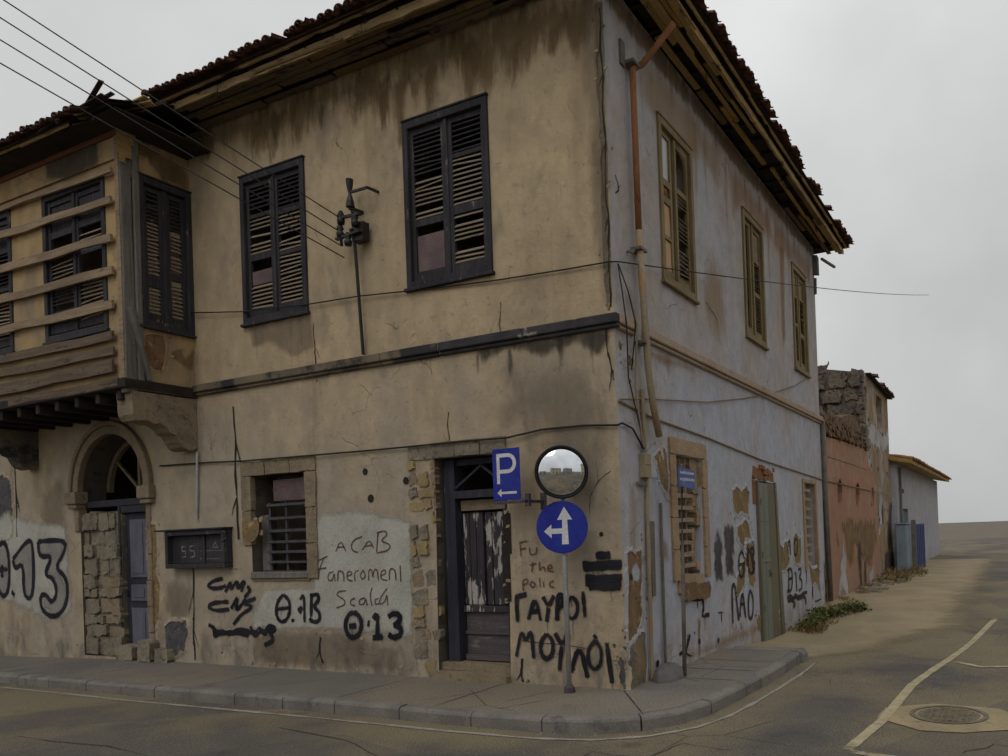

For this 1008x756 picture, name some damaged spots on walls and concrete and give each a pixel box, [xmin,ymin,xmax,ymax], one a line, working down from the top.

damp [199,0,585,154]
damp [608,0,812,253]
spalling [652,441,671,502]
spalling [612,533,659,690]
spalling [680,581,711,602]
spalling [730,478,757,600]
spalling [780,524,821,595]